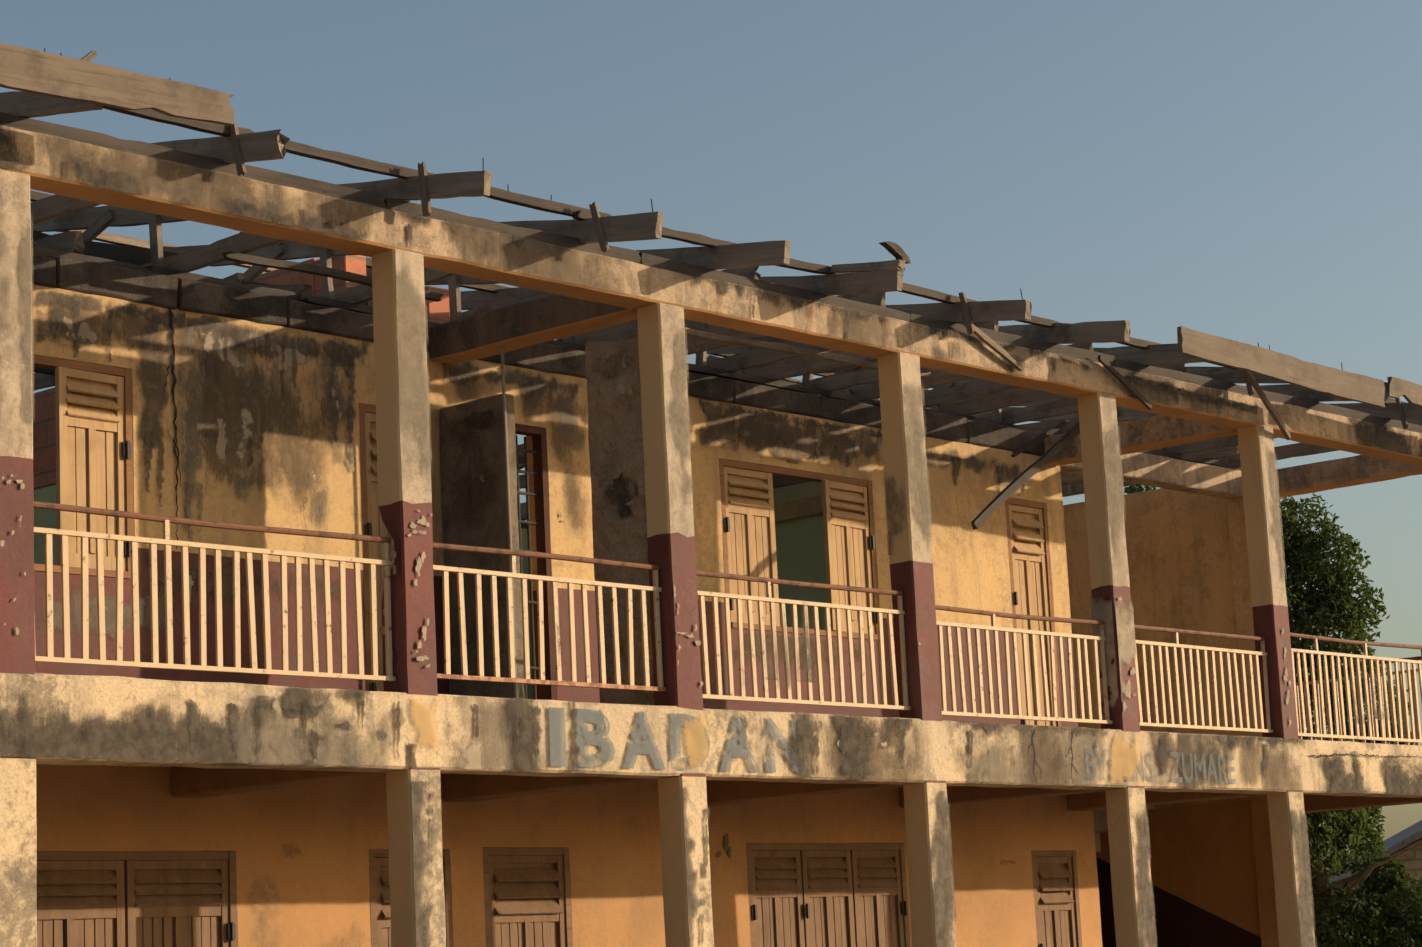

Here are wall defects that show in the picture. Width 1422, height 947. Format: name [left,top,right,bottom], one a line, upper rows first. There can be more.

leakage [45,134,374,241]
leakage [0,215,368,638]
crack [163,308,214,549]
peeling [216,408,257,463]
peeling [408,509,433,537]
peeling [413,552,426,587]
peeling [415,618,430,668]
leakage [788,713,921,781]
leakage [957,721,1107,786]
leakage [1321,751,1422,794]
leakage [0,686,435,947]
leakage [683,787,709,947]